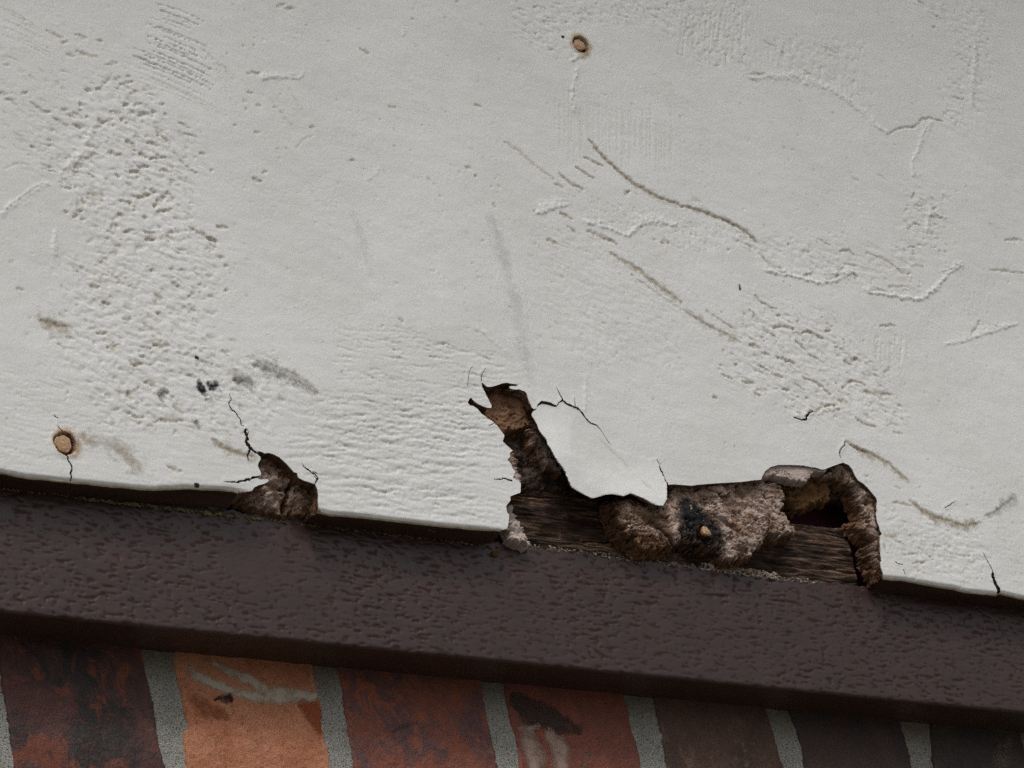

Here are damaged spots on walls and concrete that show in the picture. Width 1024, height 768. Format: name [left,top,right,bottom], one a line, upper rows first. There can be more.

rust [572,34,590,55]
rust [55,430,79,455]
crack [224,394,260,483]
crack [538,389,607,439]
spalling [231,451,321,523]
spalling [468,383,883,588]